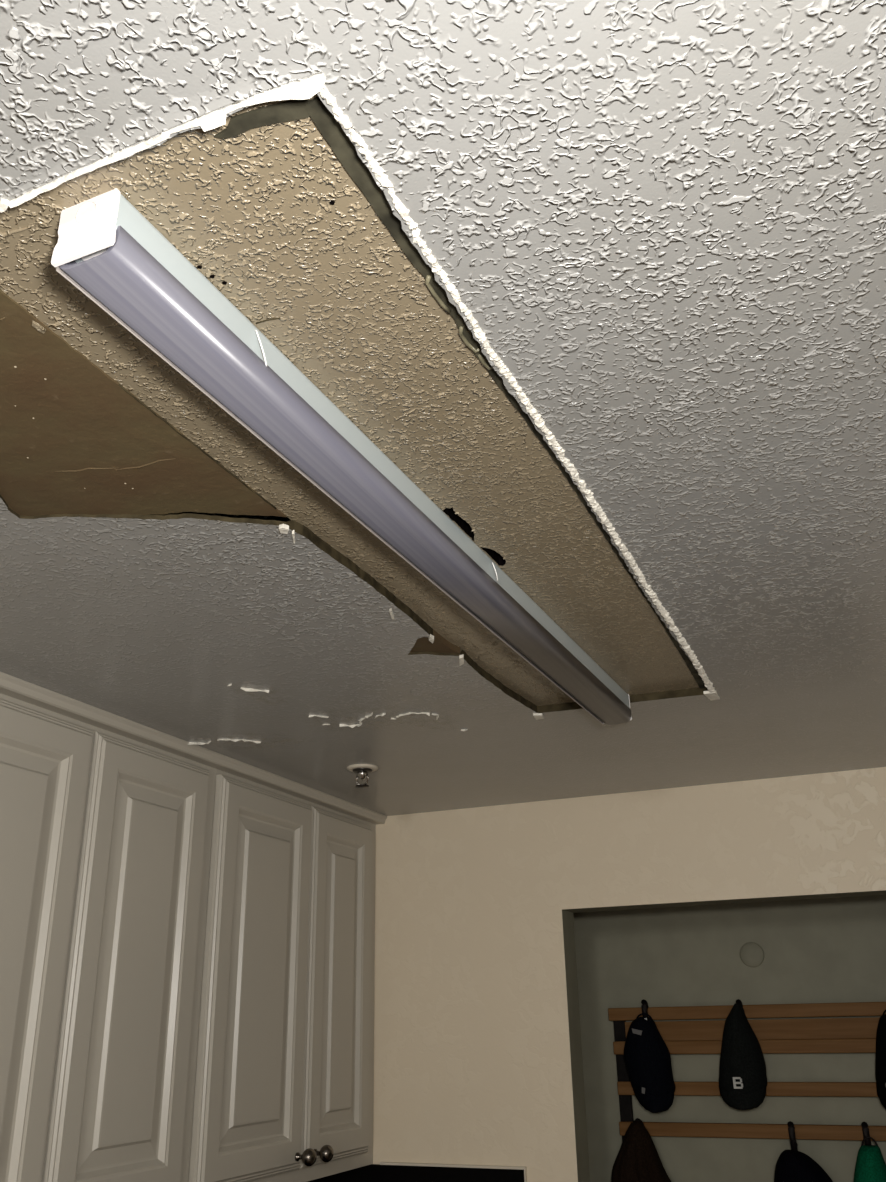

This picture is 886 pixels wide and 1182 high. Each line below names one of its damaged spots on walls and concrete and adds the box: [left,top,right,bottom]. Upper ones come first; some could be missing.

peeling [0,199,9,213]